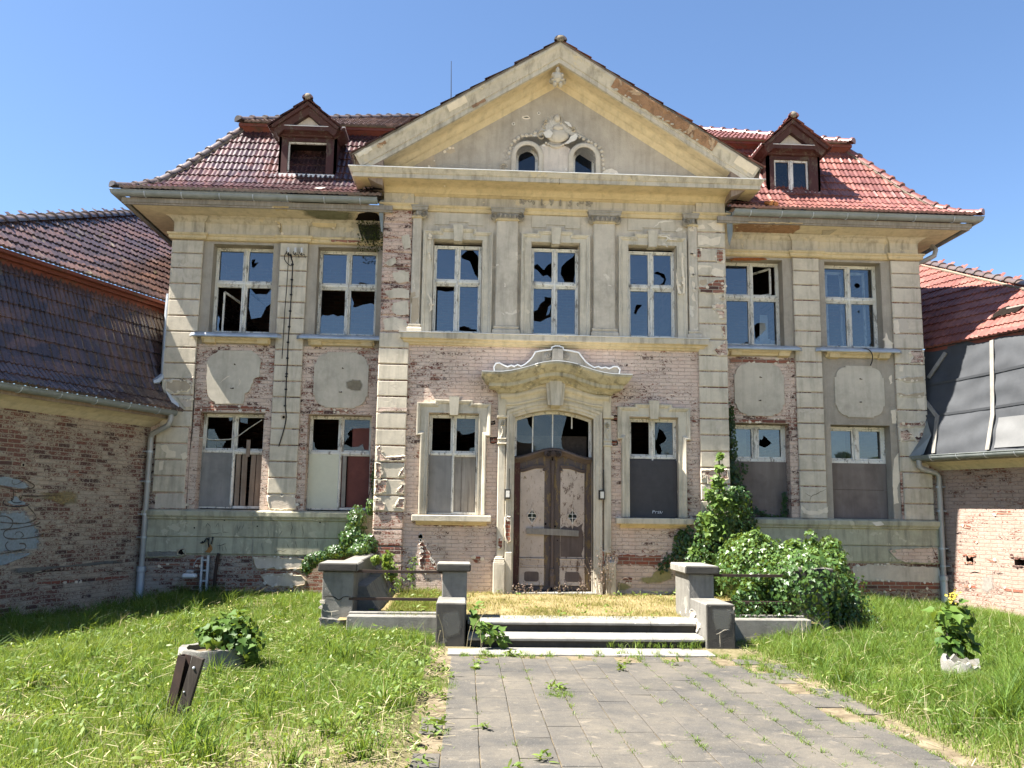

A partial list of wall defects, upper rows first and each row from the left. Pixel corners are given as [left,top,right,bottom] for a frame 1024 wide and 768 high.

spalling [611,77,718,151]
spalling [373,446,406,511]
spalling [418,525,478,575]